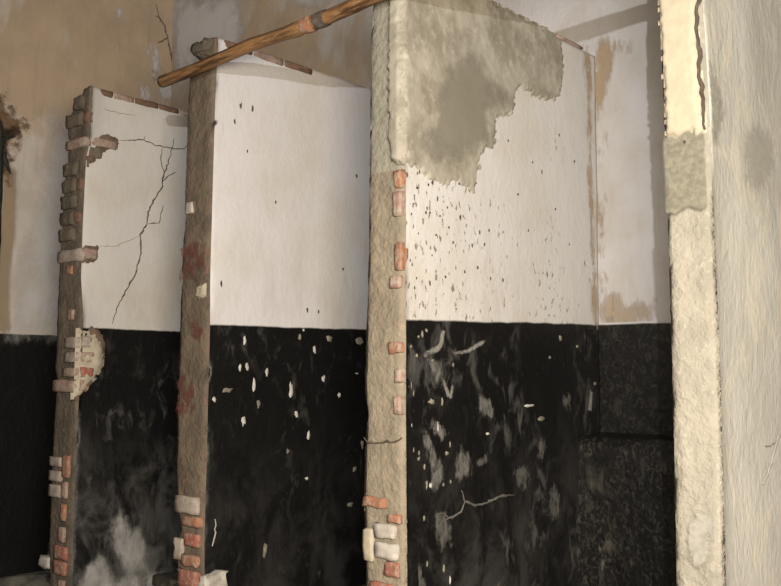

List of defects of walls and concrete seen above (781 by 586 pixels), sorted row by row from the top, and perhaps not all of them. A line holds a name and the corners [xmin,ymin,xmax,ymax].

peeling [175,0,243,69]
peeling [140,44,182,103]
crack [104,137,187,324]
water stain [79,516,157,586]